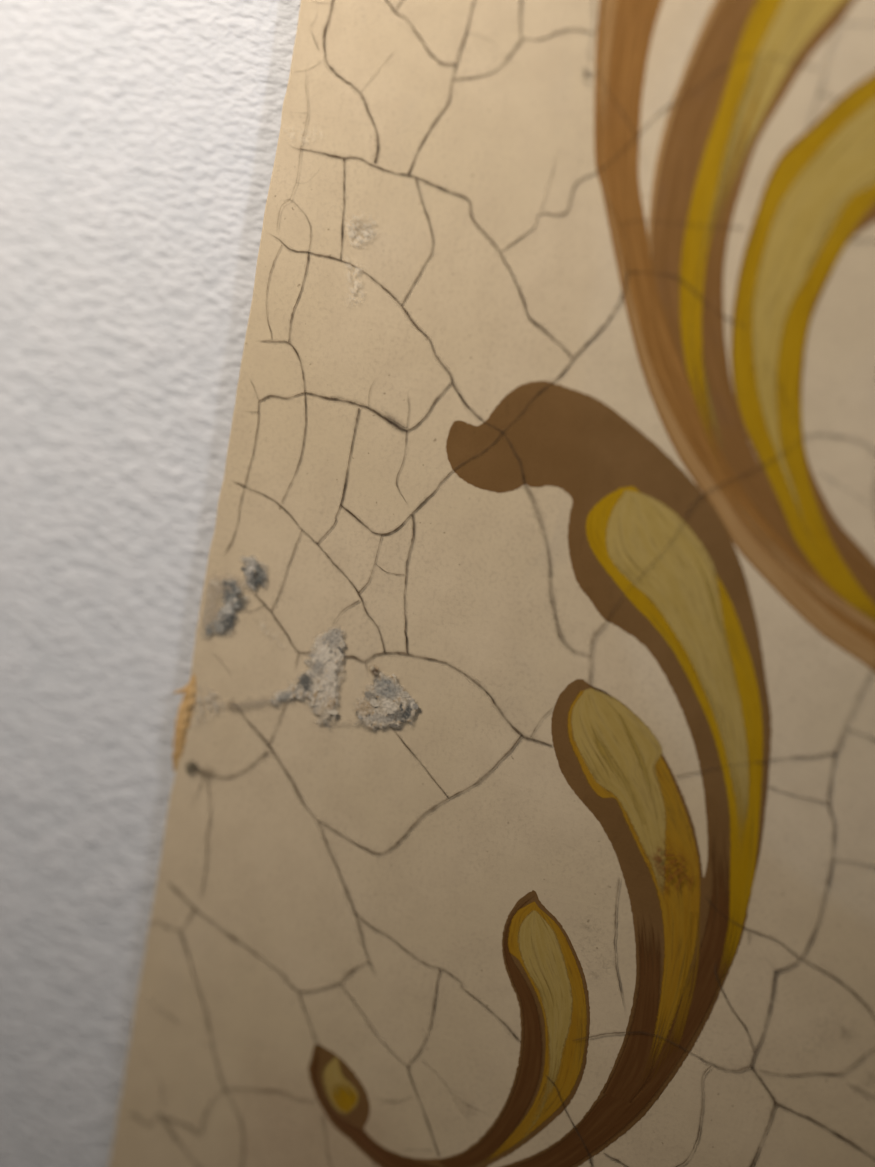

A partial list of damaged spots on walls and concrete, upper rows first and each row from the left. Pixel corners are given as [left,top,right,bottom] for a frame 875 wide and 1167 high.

crack [236,0,639,854]
spalling [202,557,266,637]
spalling [172,674,197,771]
spalling [355,672,419,730]
crack [769,733,875,886]
crack [614,881,622,995]
crack [344,887,480,1156]
crack [676,927,875,1167]
crack [546,1076,628,1167]